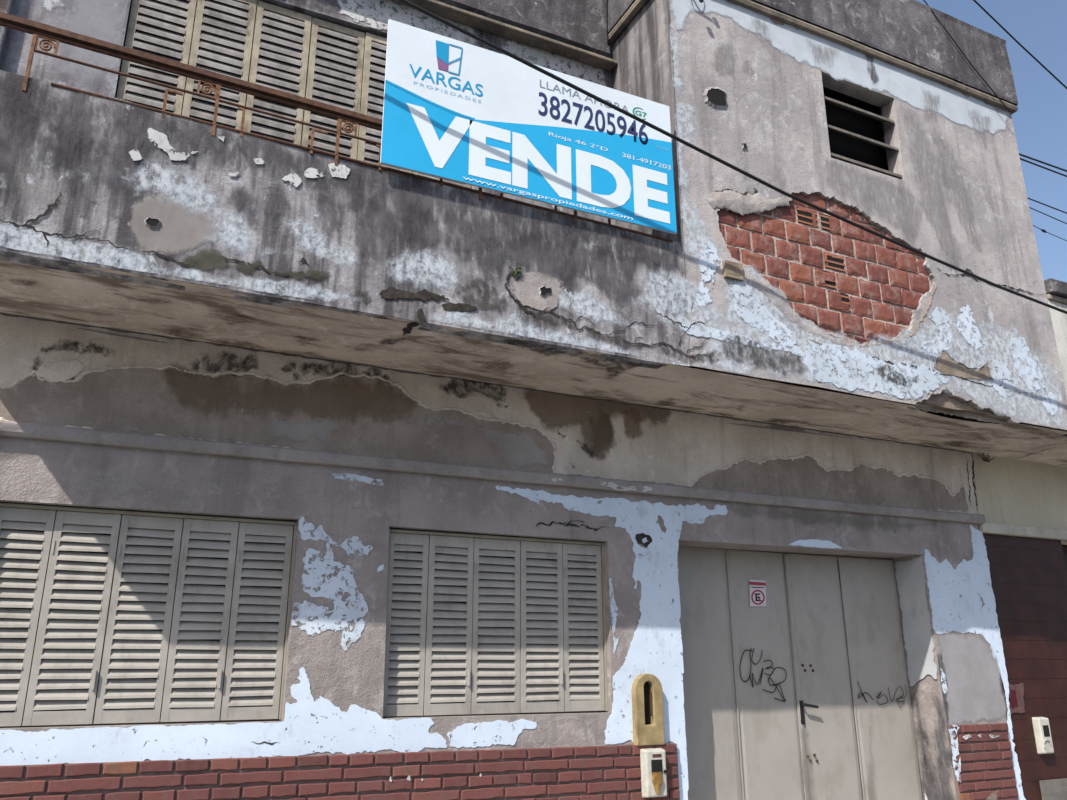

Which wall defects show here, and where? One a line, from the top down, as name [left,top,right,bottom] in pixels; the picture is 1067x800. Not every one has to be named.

peeling [338,0,477,45]
peeling [670,0,1008,134]
water stain [58,129,134,211]
crack [0,193,192,269]
water stain [230,187,254,222]
crack [222,256,329,280]
peeling [638,87,1065,428]
crack [504,272,721,357]
water stain [165,337,548,467]
water stain [525,390,675,459]
flaking render [0,359,728,800]
peeling [688,451,1026,800]